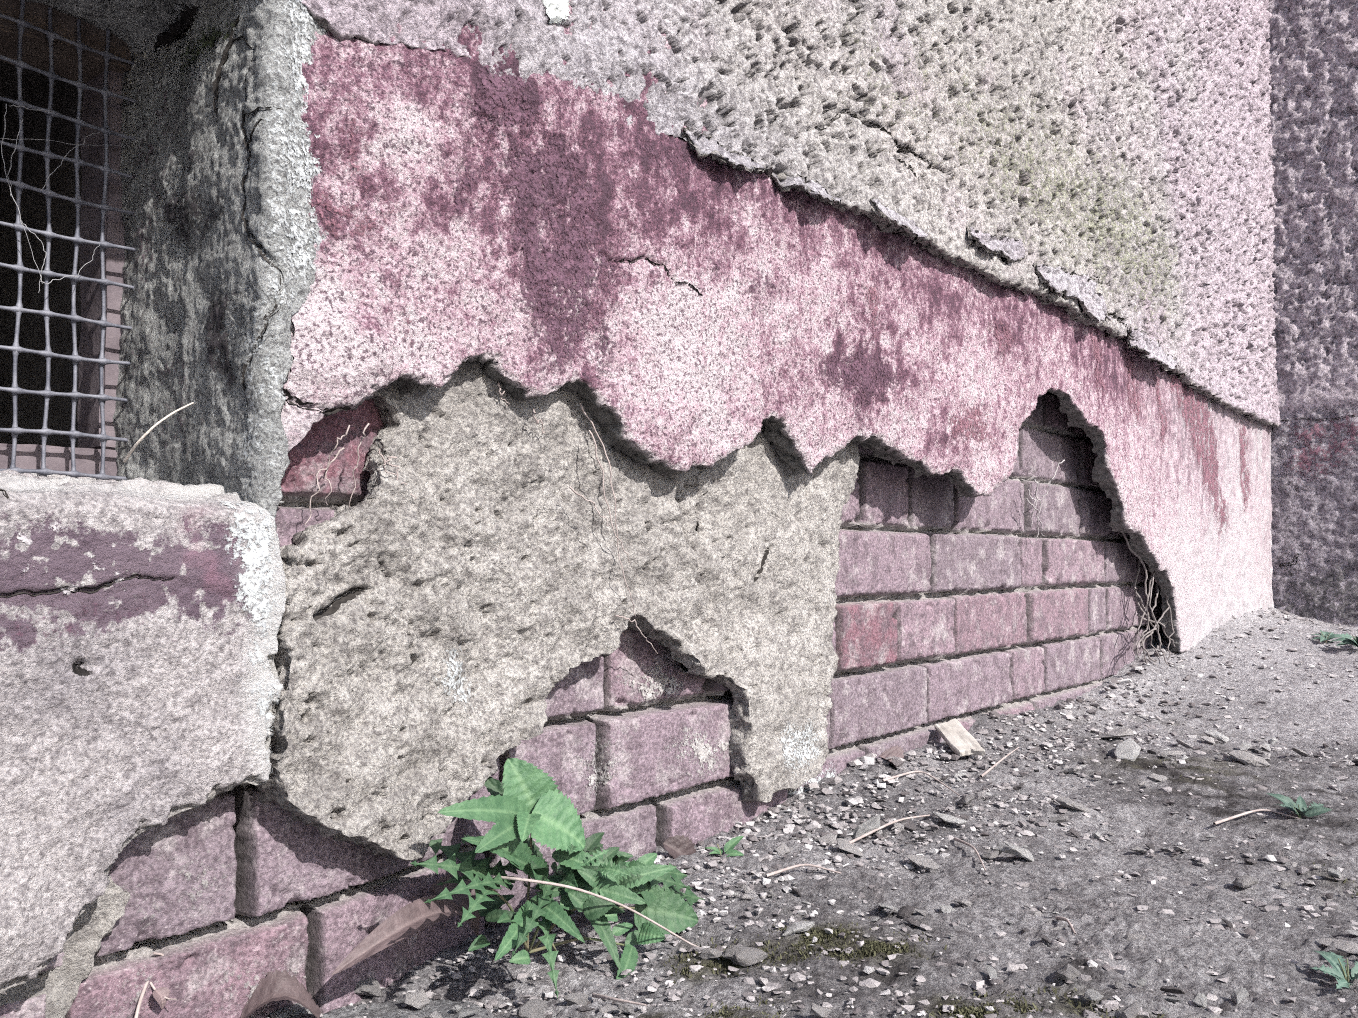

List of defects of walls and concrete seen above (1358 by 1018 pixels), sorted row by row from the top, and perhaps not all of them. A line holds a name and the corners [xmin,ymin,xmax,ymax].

peeling [682,126,843,205]
crack [212,0,284,429]
water stain [450,64,623,377]
crack [603,255,703,296]
water stain [737,268,782,307]
peeling [966,225,1112,324]
peeling [1126,325,1180,372]
crack [281,389,351,415]
water stain [1125,352,1230,533]
water stain [1239,418,1251,512]
crack [0,574,172,598]
spalling [0,361,1163,1018]